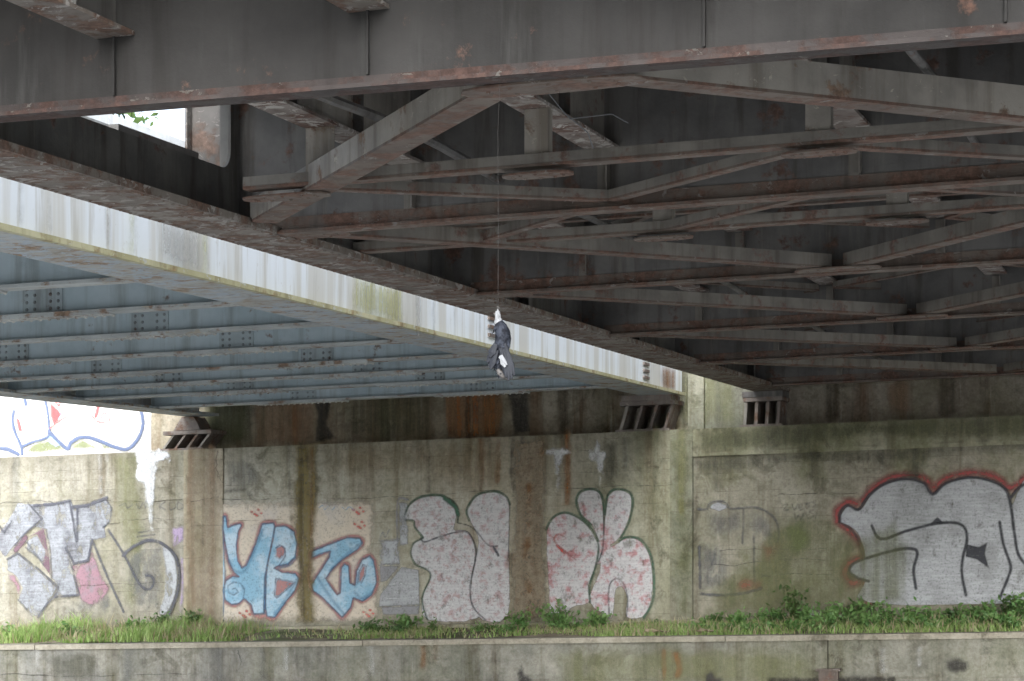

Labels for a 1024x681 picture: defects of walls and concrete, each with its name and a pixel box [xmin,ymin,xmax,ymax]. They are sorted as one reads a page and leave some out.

water stain [165,224,206,262]
rust [663,369,675,388]
rust [446,395,501,442]
water stain [136,450,169,520]
water stain [294,402,332,622]